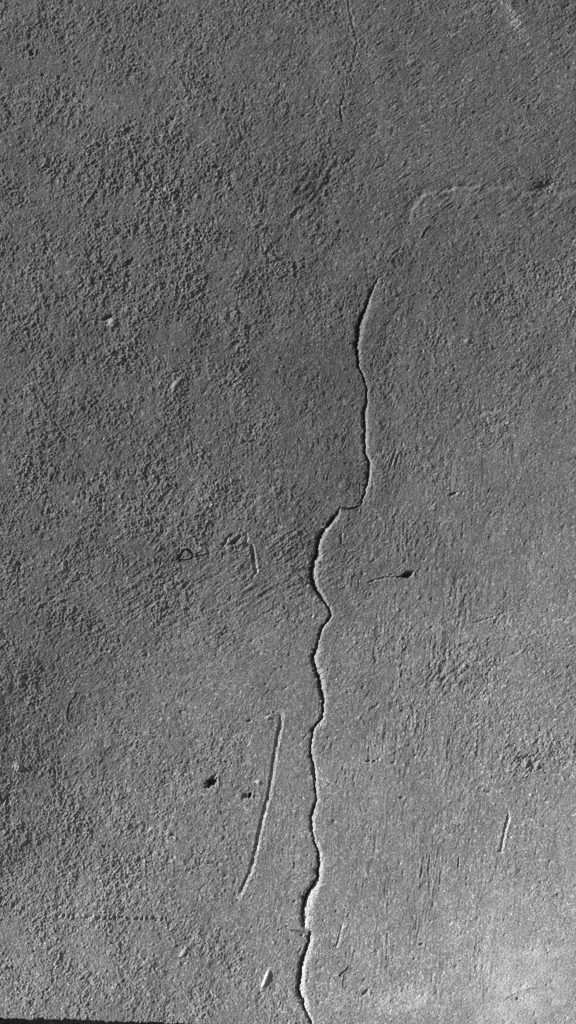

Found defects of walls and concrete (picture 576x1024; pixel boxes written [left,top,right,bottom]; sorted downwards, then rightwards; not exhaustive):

crack [290,225,434,1024]